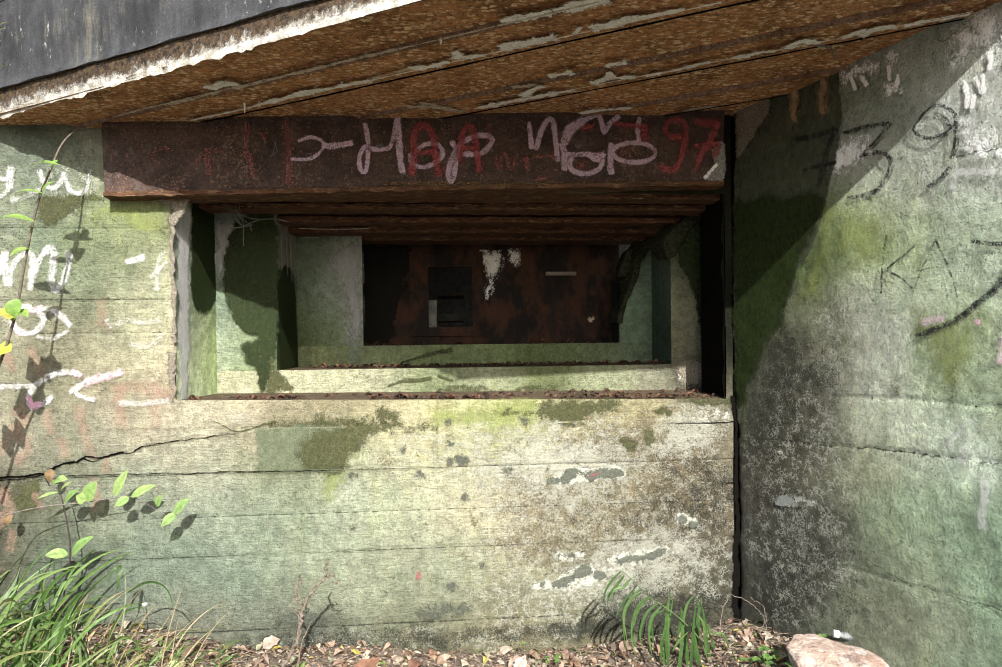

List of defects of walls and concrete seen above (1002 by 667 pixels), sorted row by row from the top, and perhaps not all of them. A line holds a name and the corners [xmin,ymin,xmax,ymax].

peeling [116,0,721,121]
peeling [404,11,973,114]
water stain [190,203,297,393]
crack [0,433,334,486]
water stain [255,405,438,506]
spalling [544,463,627,486]
crack [854,446,1002,465]
spalling [531,545,670,592]
crack [869,560,1002,611]